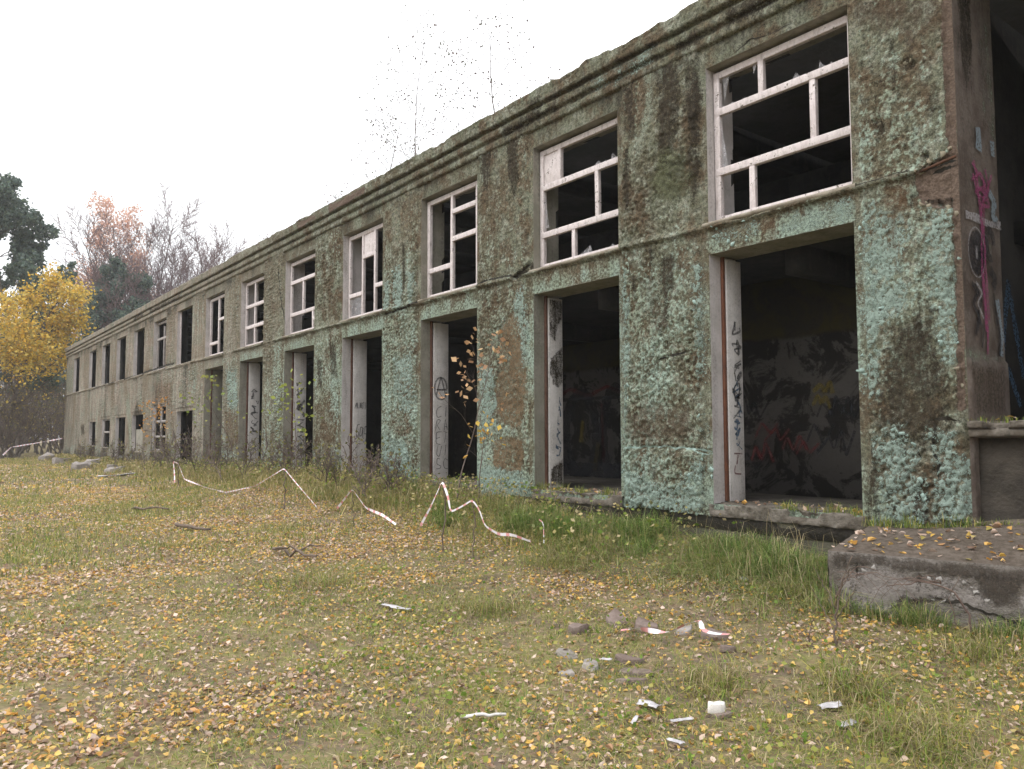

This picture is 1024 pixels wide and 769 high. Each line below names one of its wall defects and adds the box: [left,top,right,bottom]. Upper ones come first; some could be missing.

leakage [725,0,785,31]
leakage [622,29,705,209]
spalling [478,263,534,496]
leakage [874,307,950,471]